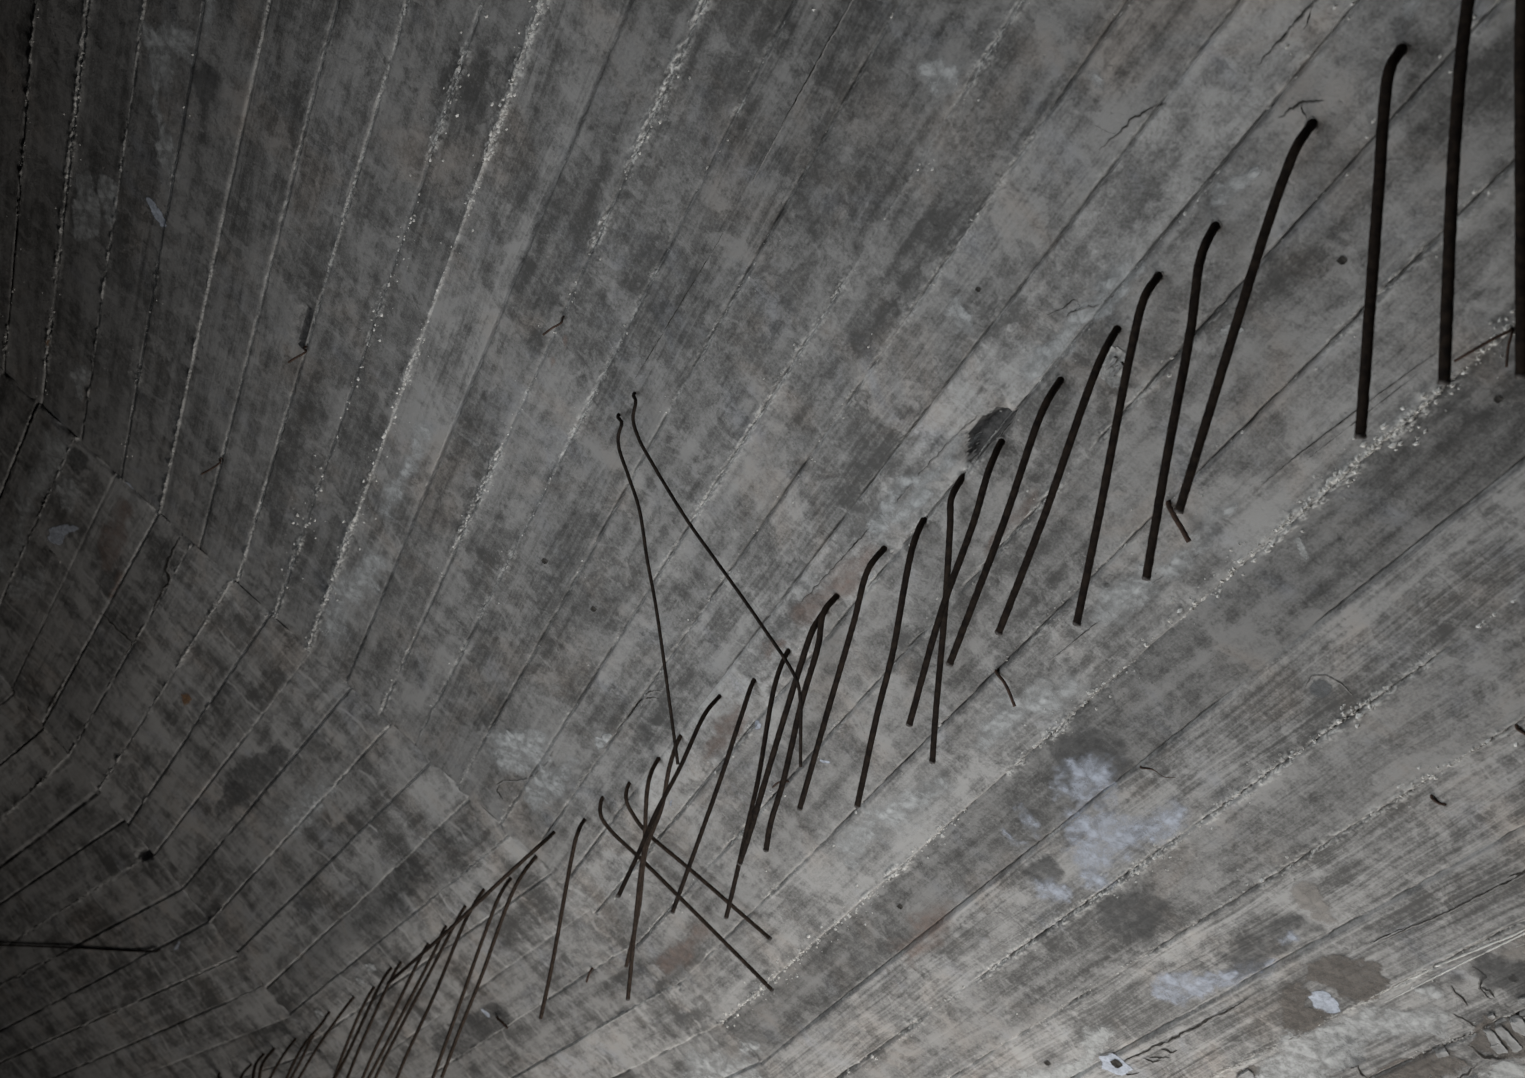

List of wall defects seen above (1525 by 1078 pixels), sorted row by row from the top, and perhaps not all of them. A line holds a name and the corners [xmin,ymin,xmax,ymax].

spalling [217,831,555,1078]
spalling [539,544,888,1019]
spalling [854,517,928,809]
spalling [906,376,1065,764]
spalling [994,270,1165,636]
leakage [1026,730,1186,938]
spalling [1141,116,1319,581]
leakage [1255,955,1450,1078]
spalling [1354,41,1411,439]
spalling [1366,975,1525,1078]
spalling [1437,0,1475,385]
spalling [1514,0,1525,379]